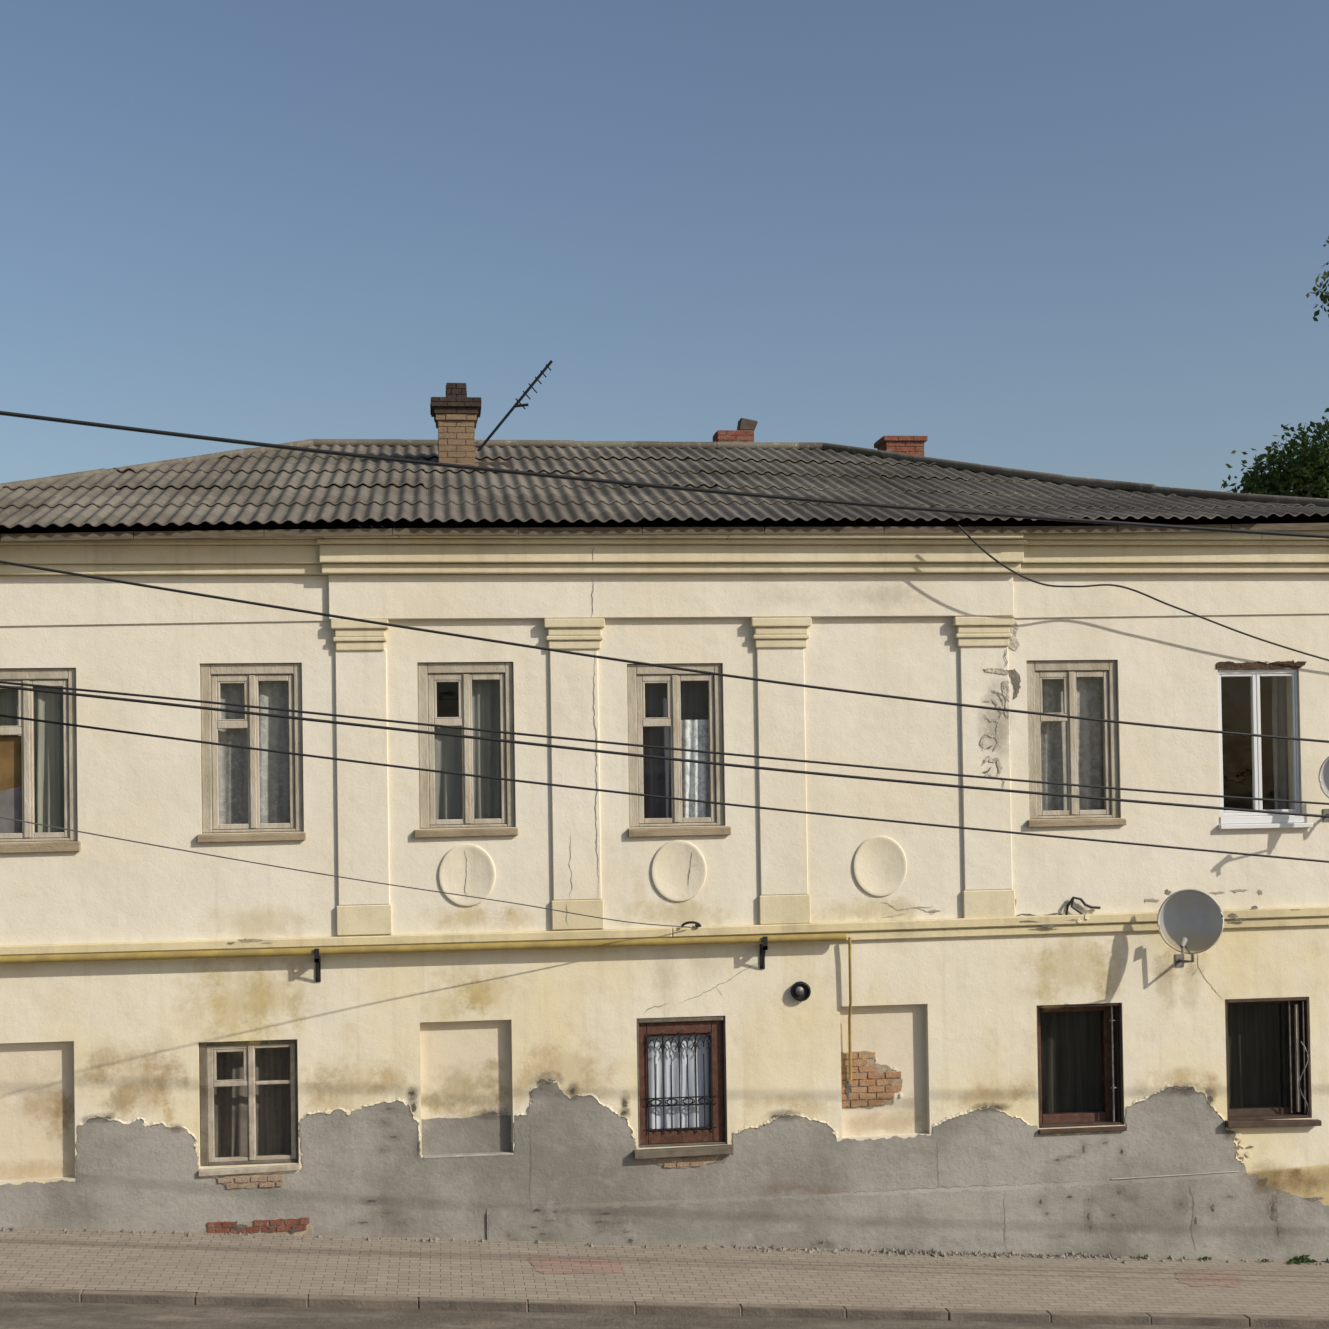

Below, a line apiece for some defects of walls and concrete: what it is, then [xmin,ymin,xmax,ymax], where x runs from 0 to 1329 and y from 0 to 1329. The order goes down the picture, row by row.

flaking render [980,620,1021,789]
crack [643,963,759,1014]
flaking render [841,1051,903,1109]
flaking render [0,1078,1329,1262]